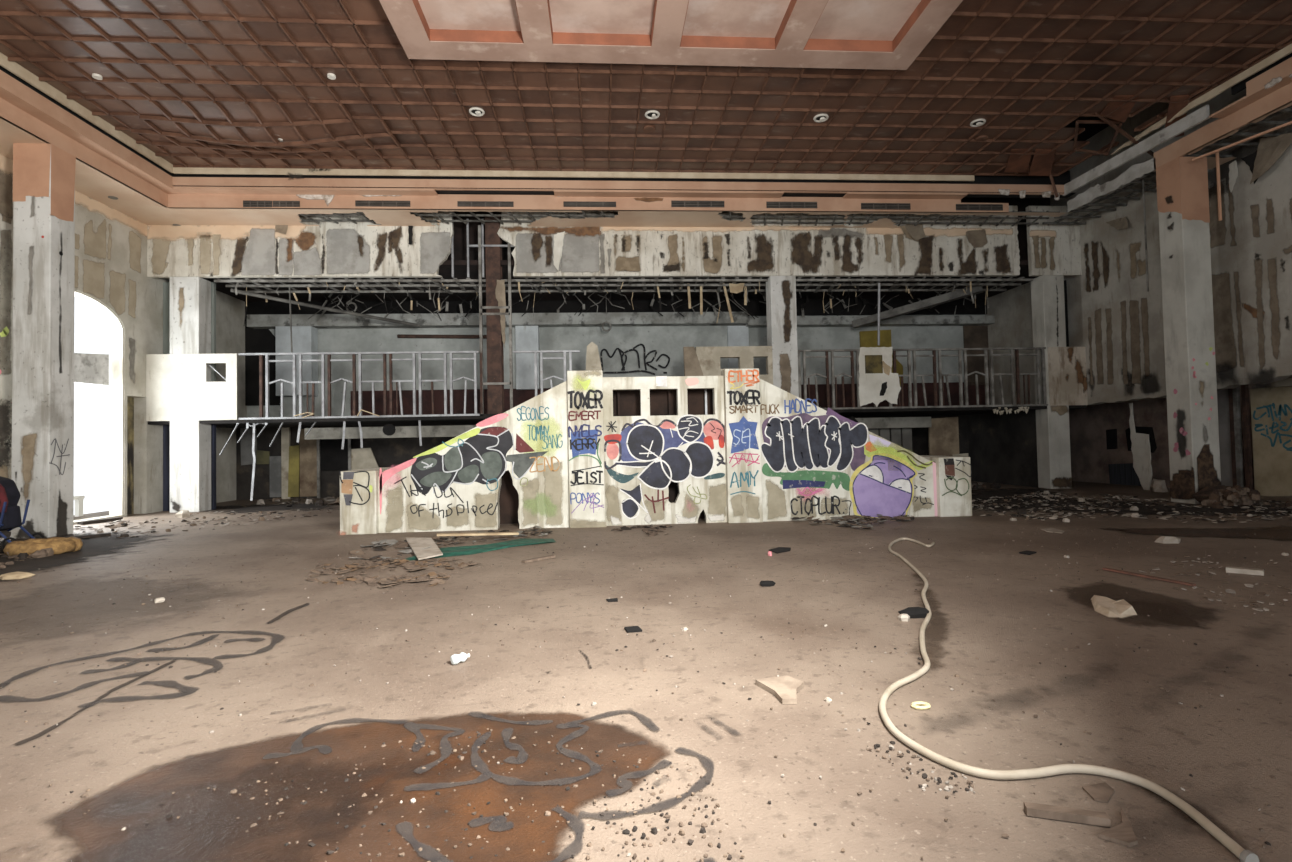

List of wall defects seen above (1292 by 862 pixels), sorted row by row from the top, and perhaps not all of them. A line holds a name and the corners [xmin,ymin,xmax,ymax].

peeling [1208,133,1292,248]
peeling [0,169,13,375]
peeling [75,220,170,318]
peeling [187,235,221,275]
peeling [242,225,370,275]
peeling [408,213,450,274]
peeling [516,231,600,273]
peeling [1088,298,1150,385]
peeling [1212,245,1292,371]
damp [0,401,37,499]
spalling [1170,444,1225,500]
damp [1067,583,1216,626]